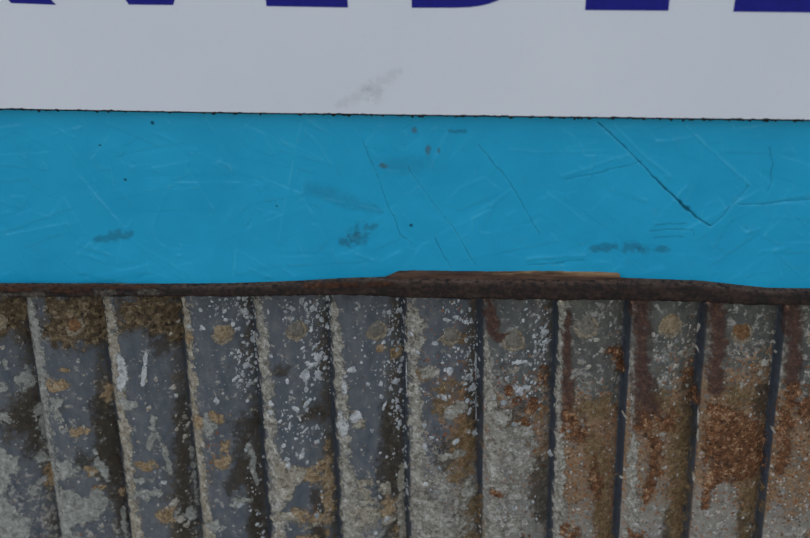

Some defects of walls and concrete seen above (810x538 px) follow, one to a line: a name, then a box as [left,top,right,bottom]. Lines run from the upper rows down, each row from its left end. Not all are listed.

rust [0,284,158,293]
leakage [0,296,187,356]
rust [304,280,395,289]
leakage [1,395,42,460]
leakage [76,395,128,526]
leakage [172,394,199,538]
leakage [225,411,262,538]
leakage [310,489,325,538]
leakage [376,404,399,505]
rust [559,520,582,538]
rust [559,310,590,445]
rust [604,301,810,538]